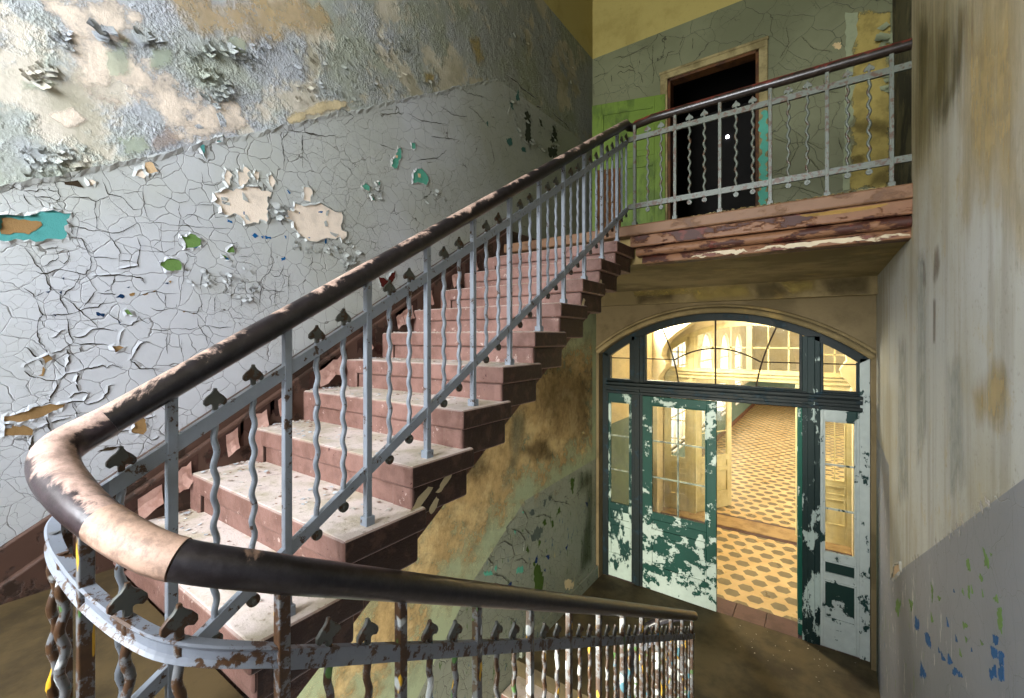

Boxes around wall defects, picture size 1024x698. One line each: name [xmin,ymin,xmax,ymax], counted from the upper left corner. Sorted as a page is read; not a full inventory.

crack [593,36,694,97]
spalling [0,31,497,193]
crack [281,109,353,170]
crack [772,131,844,196]
peeling [0,206,73,246]
peeling [211,164,364,271]
peeling [692,233,910,258]
crack [21,176,319,451]
peeling [0,401,69,440]
leakage [402,343,592,575]
leakage [351,601,427,643]
leakage [334,663,388,698]